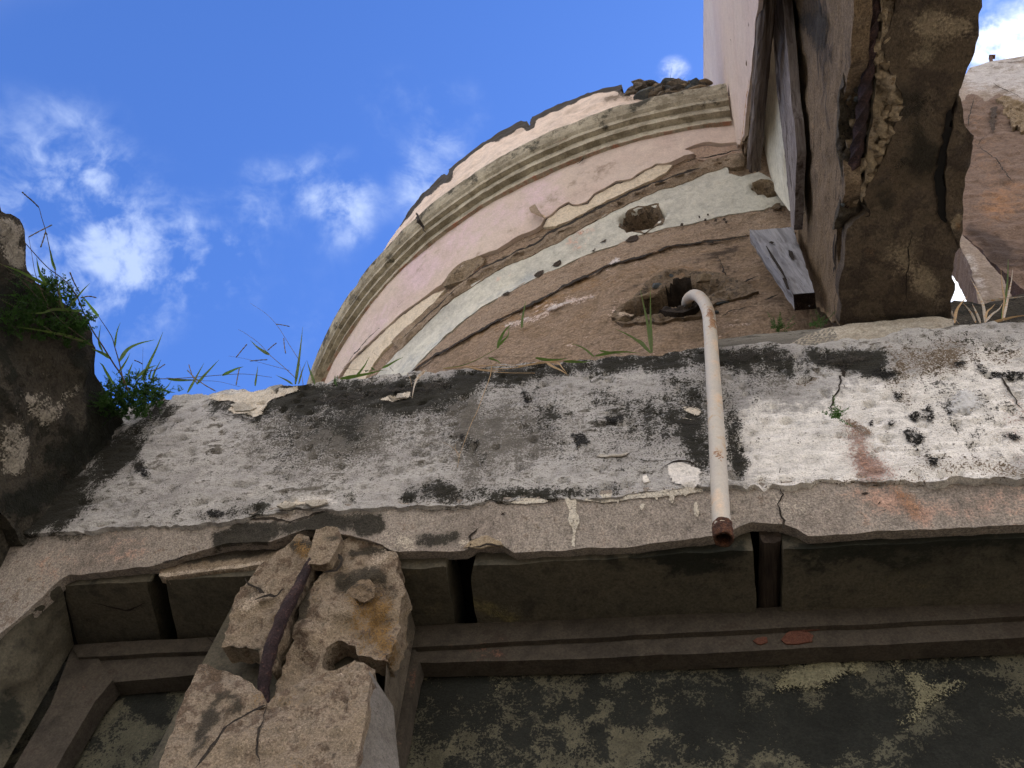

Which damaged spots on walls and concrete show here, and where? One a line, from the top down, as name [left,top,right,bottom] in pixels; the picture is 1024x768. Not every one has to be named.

spalling [340,80,759,379]
water stain [723,347,894,381]
crack [830,361,848,410]
water stain [953,360,1024,381]
corrosion [842,418,883,472]
water stain [888,401,953,445]
peeling [665,460,701,488]
water stain [565,487,703,547]
crack [777,471,787,528]
peeling [306,526,344,572]
spalling [348,579,378,604]
crack [195,705,266,768]